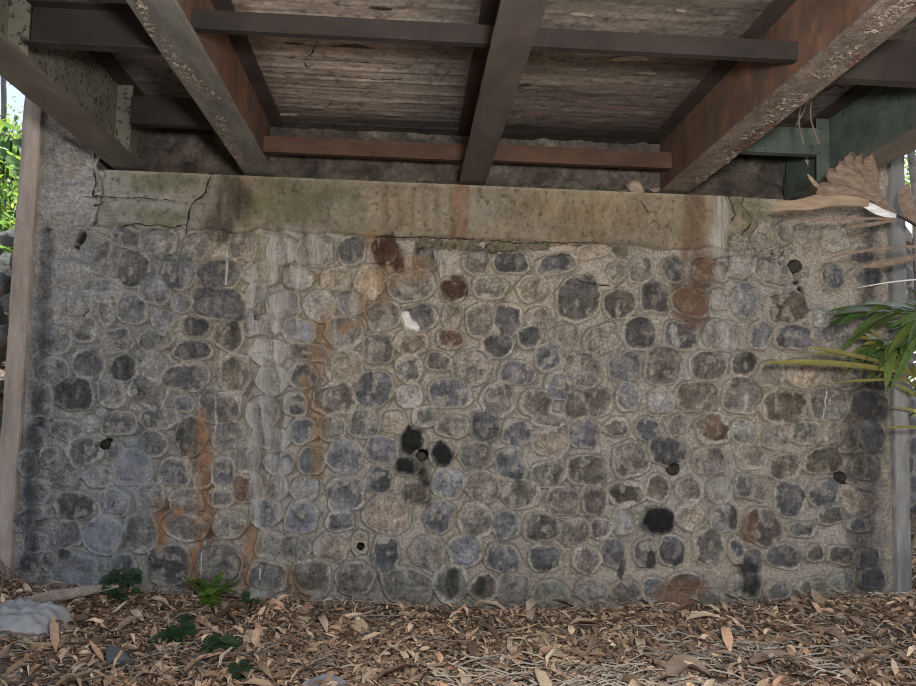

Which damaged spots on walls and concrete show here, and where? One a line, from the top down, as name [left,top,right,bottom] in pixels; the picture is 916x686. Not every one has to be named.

crack [83,172,211,235]